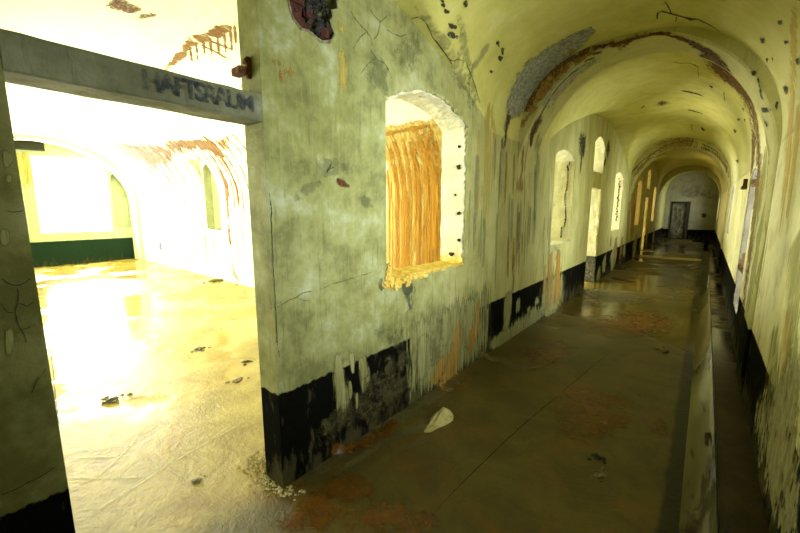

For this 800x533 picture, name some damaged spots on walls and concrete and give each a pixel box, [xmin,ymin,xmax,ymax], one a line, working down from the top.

rust [164,23,237,70]
spalling [287,0,338,44]
crack [351,10,480,102]
spalling [504,27,596,131]
crack [524,1,751,220]
rust [104,134,249,246]
rust [634,137,729,177]
water stain [766,232,800,413]
crack [32,352,59,423]